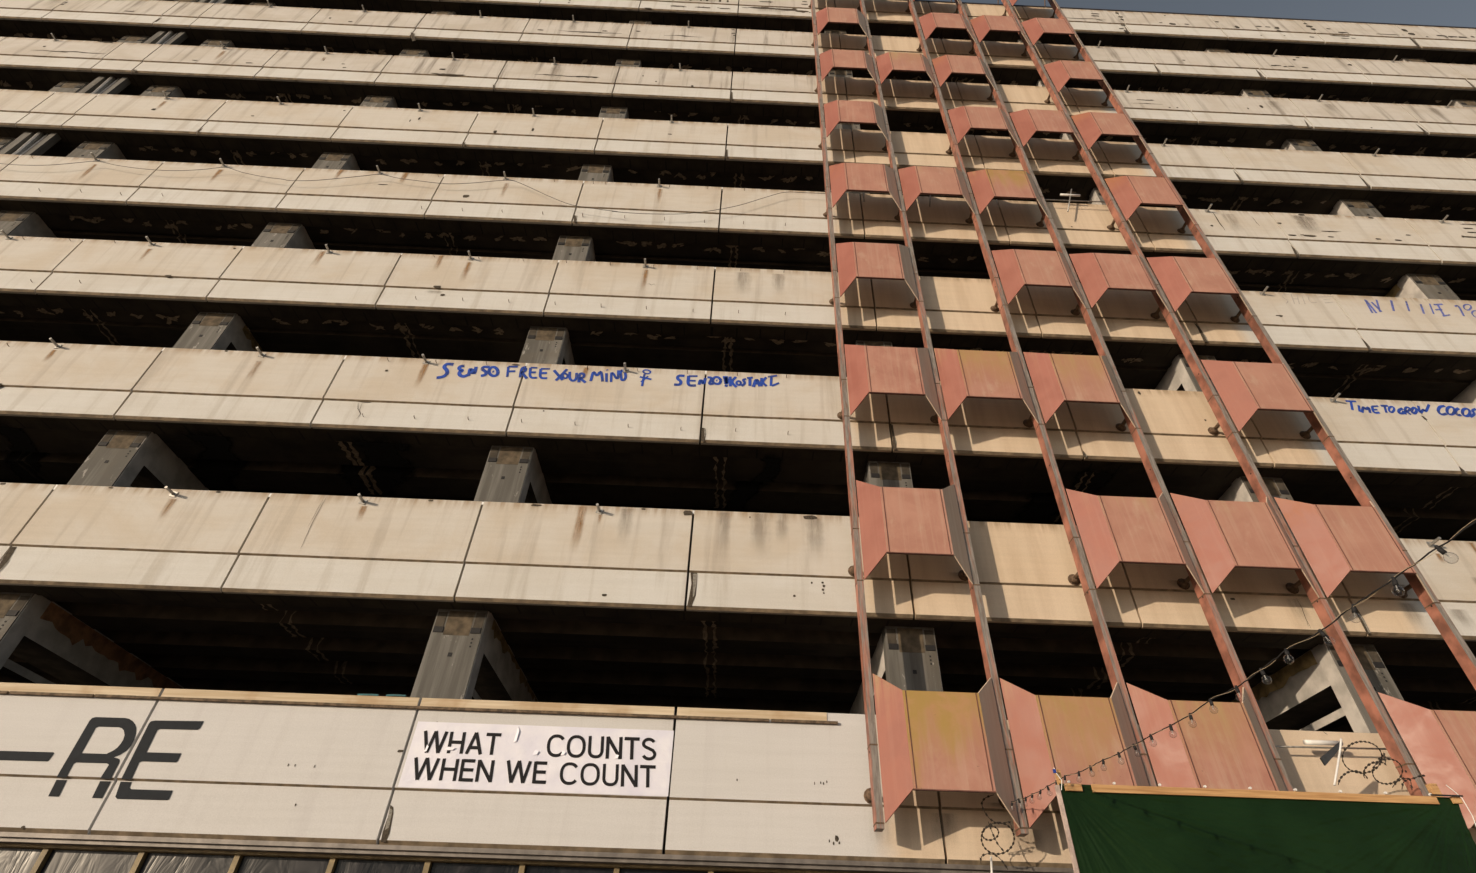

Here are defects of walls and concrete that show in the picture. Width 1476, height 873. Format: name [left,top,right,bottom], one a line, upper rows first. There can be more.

peeling [40,602,184,689]